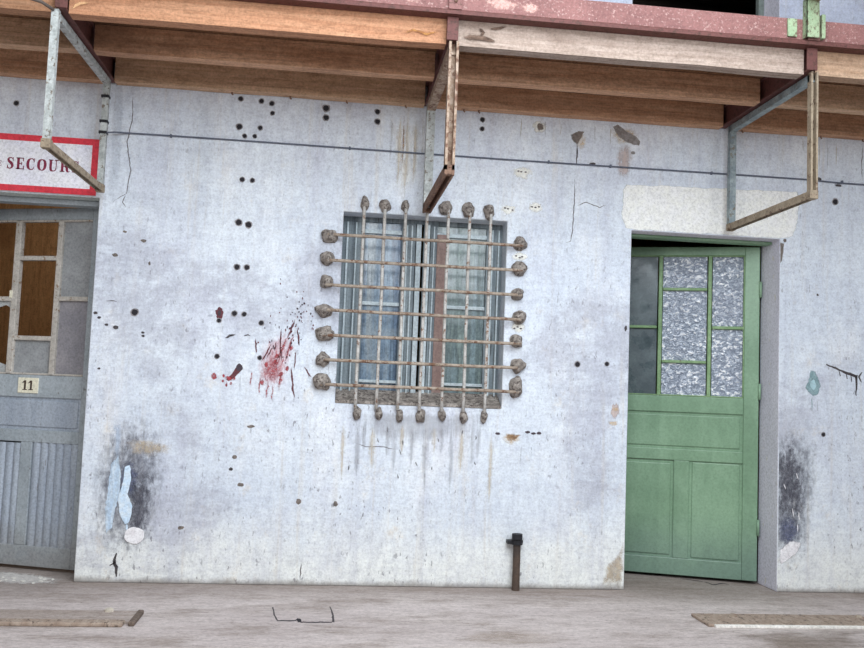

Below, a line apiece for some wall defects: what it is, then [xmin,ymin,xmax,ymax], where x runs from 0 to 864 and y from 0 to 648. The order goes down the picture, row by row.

crack [826,364,862,396]